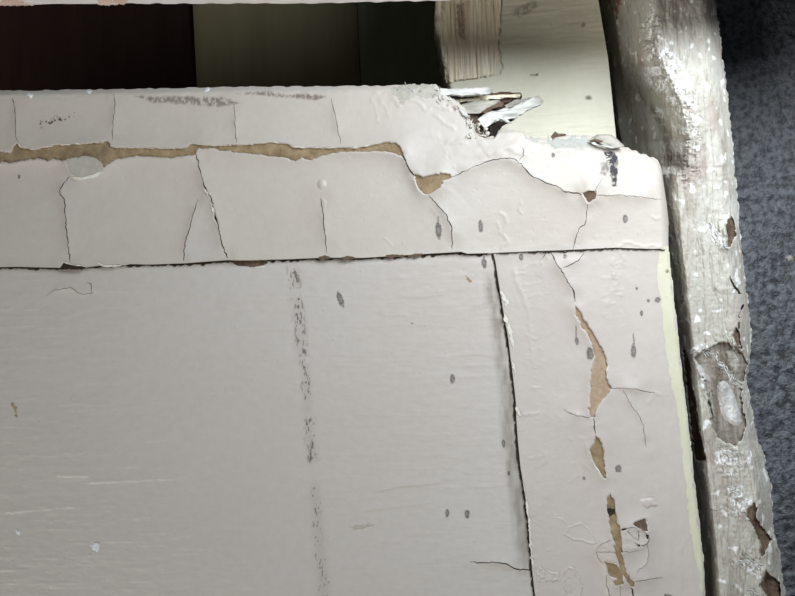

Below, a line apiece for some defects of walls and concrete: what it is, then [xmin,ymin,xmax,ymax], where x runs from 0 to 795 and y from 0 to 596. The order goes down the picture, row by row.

peeling [0,141,403,180]
peeling [415,172,451,194]
crack [0,149,665,596]
peeling [575,304,611,417]
peeling [590,437,606,478]
spalling [657,246,749,593]
peeling [604,494,649,587]
spalling [727,485,781,596]